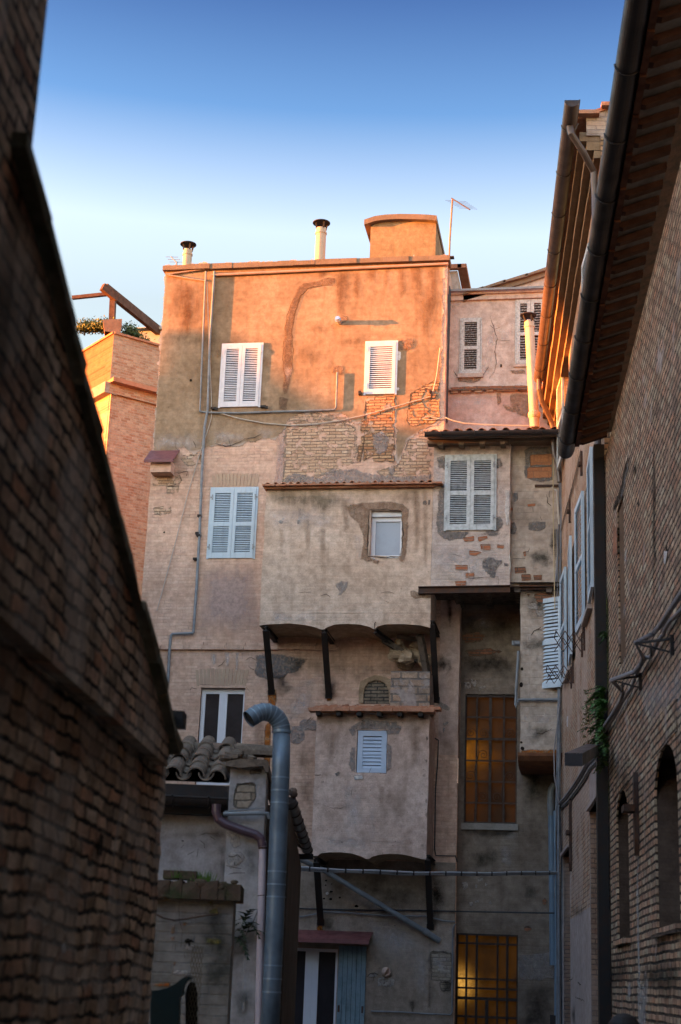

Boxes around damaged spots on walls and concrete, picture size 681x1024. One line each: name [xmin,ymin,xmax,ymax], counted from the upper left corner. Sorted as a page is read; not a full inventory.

spalling [281,370,528,482]
crack [393,300,509,461]
spalling [455,536,554,617]